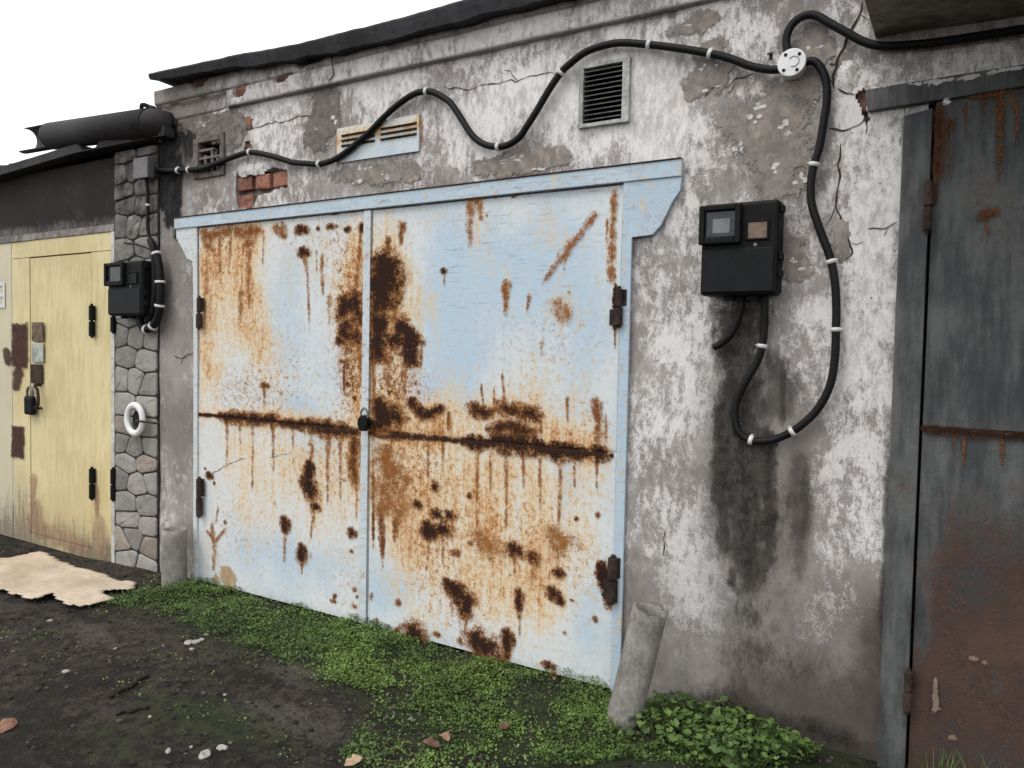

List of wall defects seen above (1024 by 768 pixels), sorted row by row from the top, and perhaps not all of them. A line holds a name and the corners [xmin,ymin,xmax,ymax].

flaking render [238,169,288,209]
rust [463,196,498,245]
crack [444,70,553,94]
rust [542,189,619,309]
peeling [664,6,836,200]
crack [825,3,896,260]
rust [932,87,1023,202]
rust [198,210,614,663]
damp [707,300,778,593]
rust [921,424,1024,467]
rust [540,660,567,680]